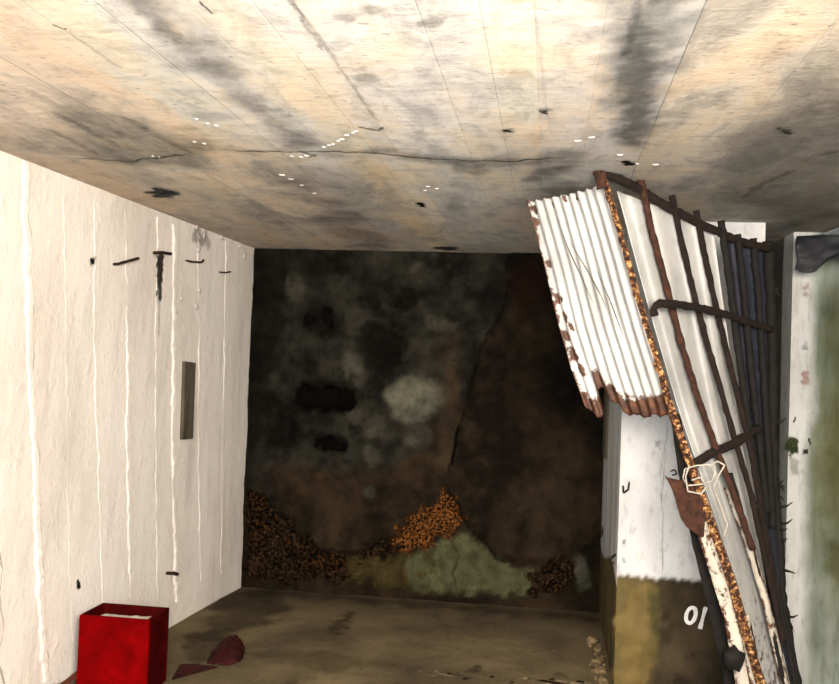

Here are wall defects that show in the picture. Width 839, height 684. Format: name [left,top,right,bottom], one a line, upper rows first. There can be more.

crack [451,424,459,466]